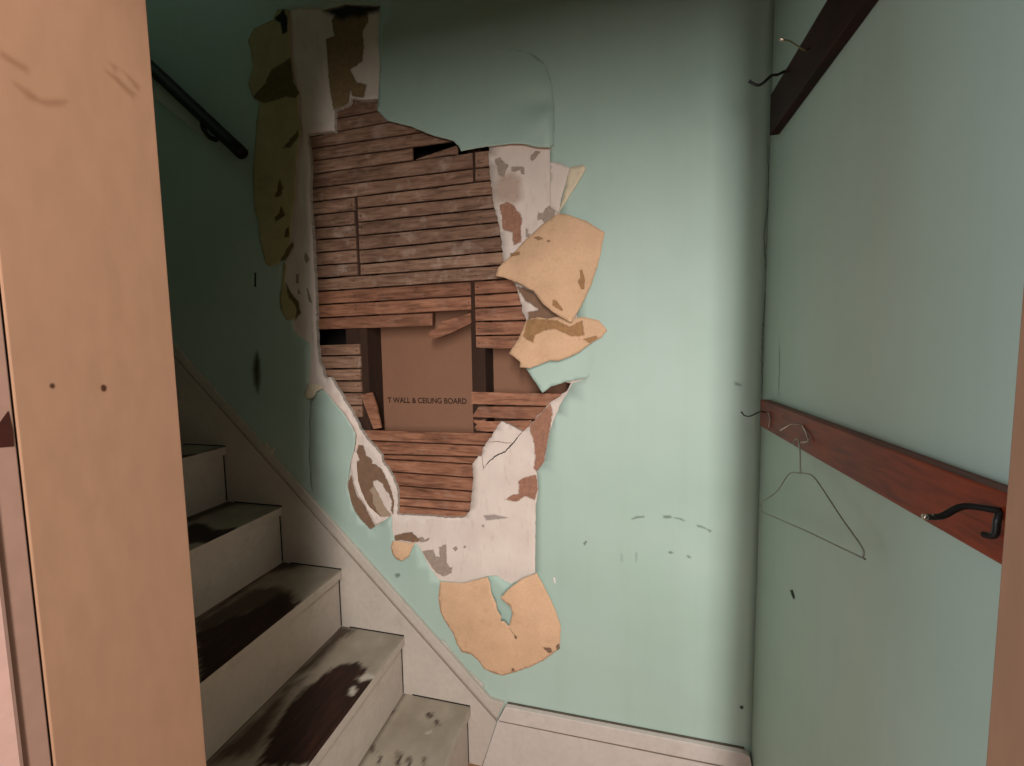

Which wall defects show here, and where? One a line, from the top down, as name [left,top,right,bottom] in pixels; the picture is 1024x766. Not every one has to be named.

flaking render [248,4,585,675]
crack [482,429,522,469]
peeling [488,144,607,368]